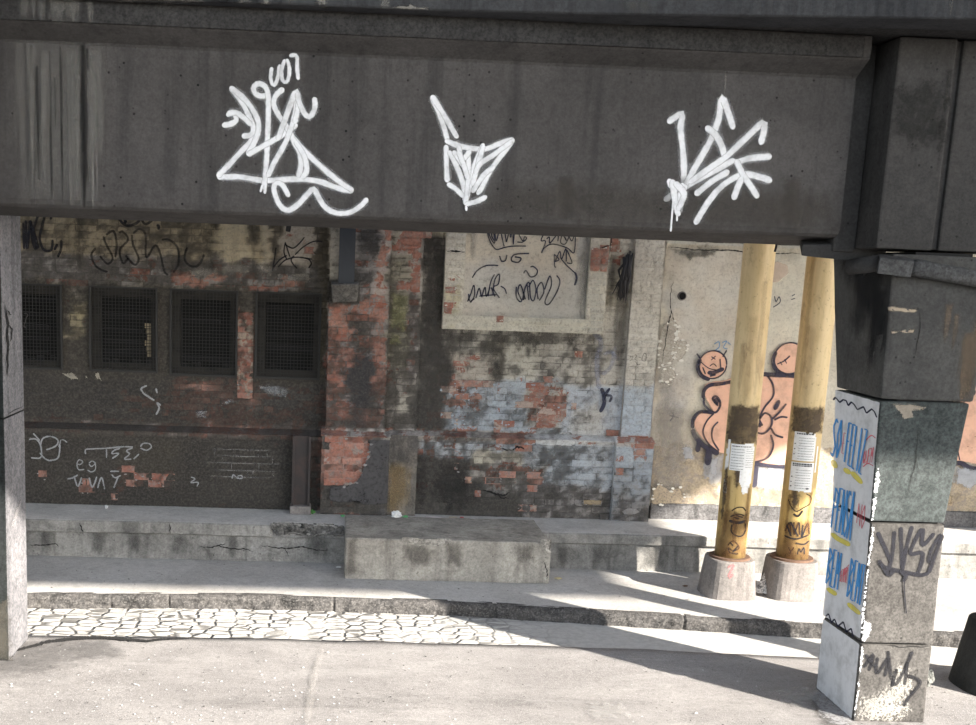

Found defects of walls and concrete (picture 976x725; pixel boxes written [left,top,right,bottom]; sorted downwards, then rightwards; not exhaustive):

damp [30,46,63,190]
damp [80,45,89,200]
spalling [237,312,254,399]
peeling [440,380,496,401]
peeling [494,376,577,432]
peeling [324,436,390,505]
crack [199,544,327,554]
spalling [270,522,344,537]